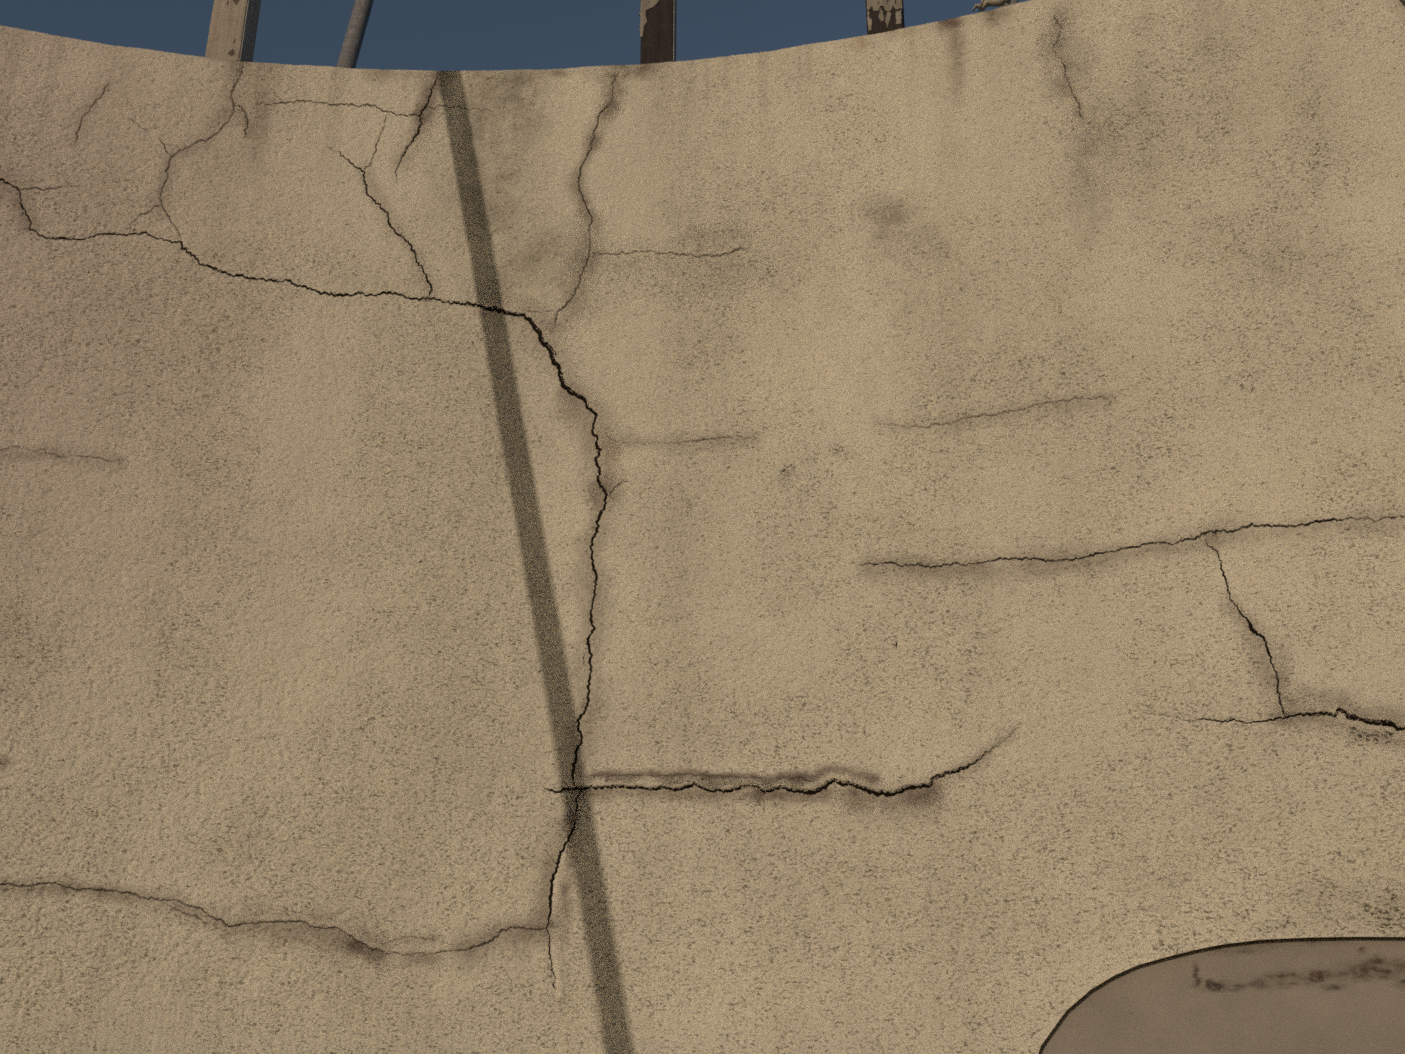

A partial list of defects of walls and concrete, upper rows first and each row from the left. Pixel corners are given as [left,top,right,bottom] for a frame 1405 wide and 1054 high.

crack [0,67,1005,998]
crack [861,515,1405,736]